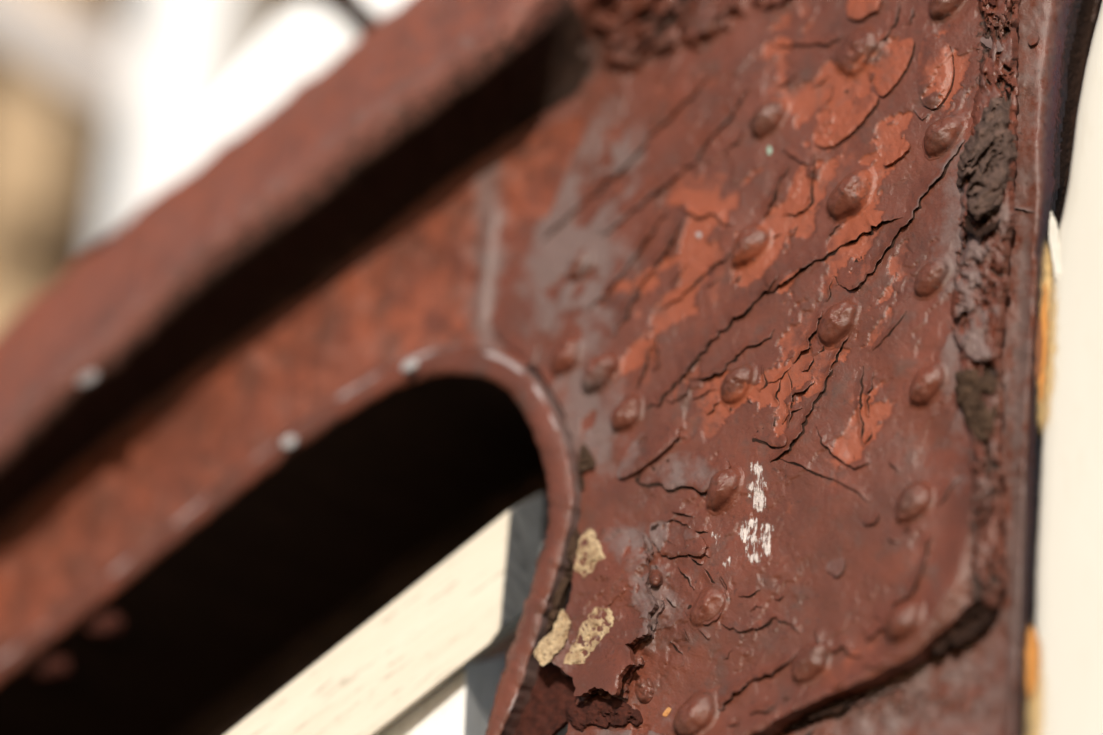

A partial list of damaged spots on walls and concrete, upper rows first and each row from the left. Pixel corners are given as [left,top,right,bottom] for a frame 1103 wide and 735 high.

peeling [846,0,883,23]
crack [879,0,915,42]
peeling [980,36,1004,53]
crack [774,68,835,115]
peeling [813,34,955,150]
peeling [883,136,911,167]
peeling [784,165,812,213]
rust [1035,250,1055,425]
peeling [617,421,731,495]
crack [604,137,965,735]
peeling [551,520,709,701]
rust [1026,627,1042,735]